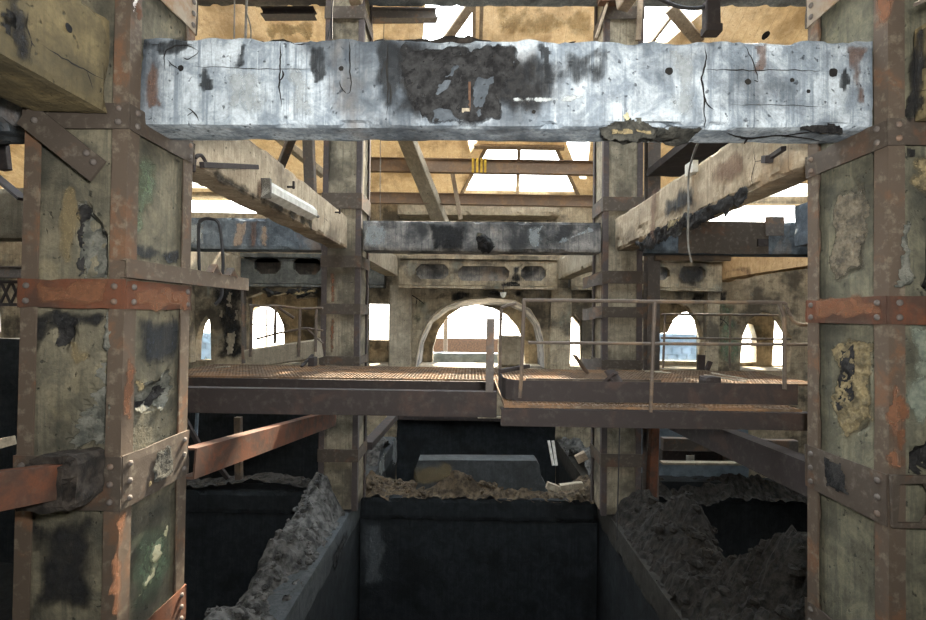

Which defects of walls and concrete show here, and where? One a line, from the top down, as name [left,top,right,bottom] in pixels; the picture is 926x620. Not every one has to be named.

leakage [0,0,29,59]
spalling [399,44,517,124]
crack [700,49,830,130]
spalling [599,112,702,147]
crack [728,132,824,185]
spalling [476,233,495,254]
spalling [635,186,748,252]
corrosion [136,287,189,312]
corrosion [816,296,880,318]
spalling [134,369,173,413]
spalling [831,338,874,437]
corrosion [110,554,121,614]